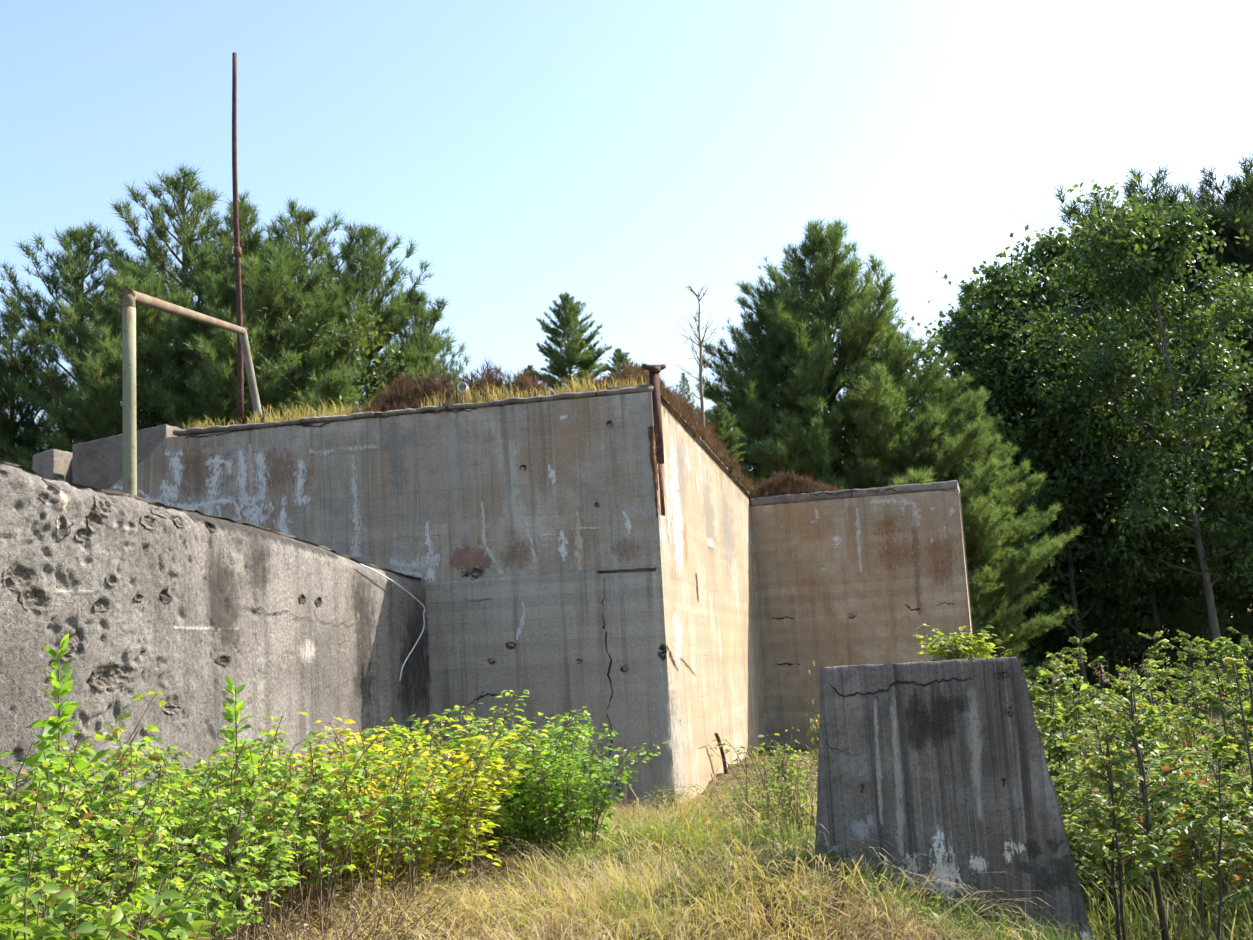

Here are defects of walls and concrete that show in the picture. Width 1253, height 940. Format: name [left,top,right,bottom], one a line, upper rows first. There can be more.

rust [648,426,659,518]
spalling [39,491,113,542]
damp [138,443,378,647]
spalling [2,564,49,613]
spalling [94,575,119,611]
crack [244,606,360,627]
spalling [88,662,140,691]
damp [398,597,431,725]
crack [602,579,623,807]
crack [829,677,973,697]
efflorescence [883,825,989,909]
damp [1003,841,1026,863]